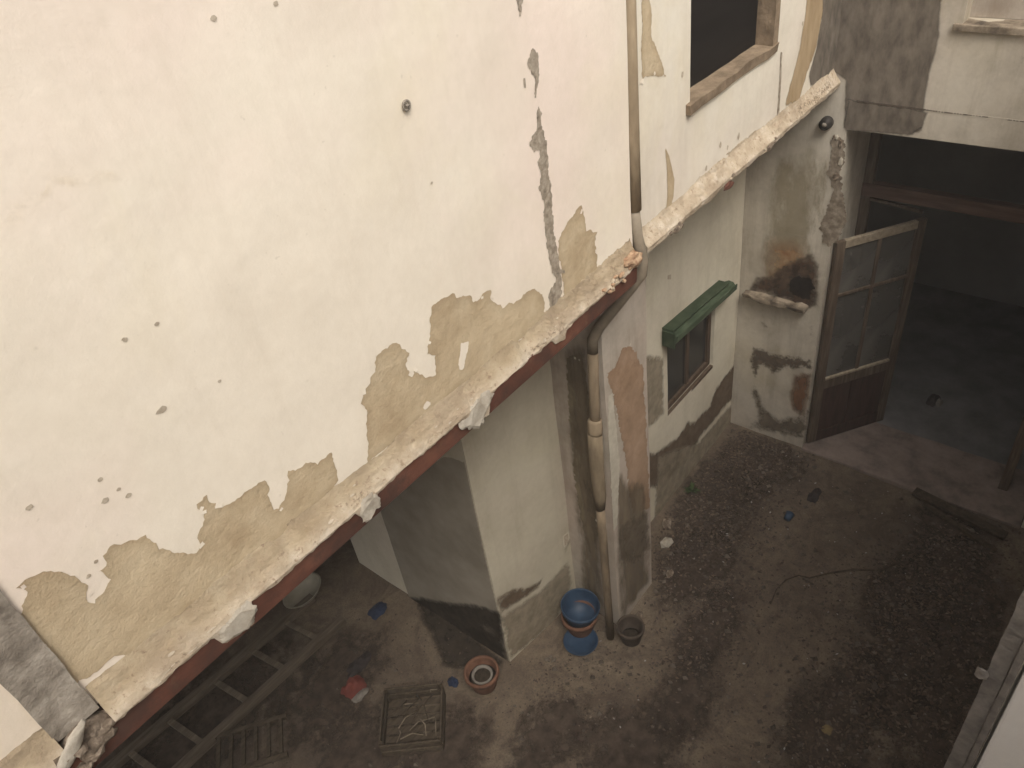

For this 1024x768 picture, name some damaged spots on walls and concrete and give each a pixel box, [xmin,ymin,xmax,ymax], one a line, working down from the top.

peeling [640,0,666,84]
damp [786,0,941,135]
spalling [819,134,847,247]
peeling [558,205,598,296]
spalling [602,250,643,294]
peeling [361,289,558,462]
peeling [607,343,650,510]
damp [646,357,664,426]
damp [649,366,734,488]
peeling [346,480,386,522]
peeling [17,452,338,684]
damp [411,581,541,668]